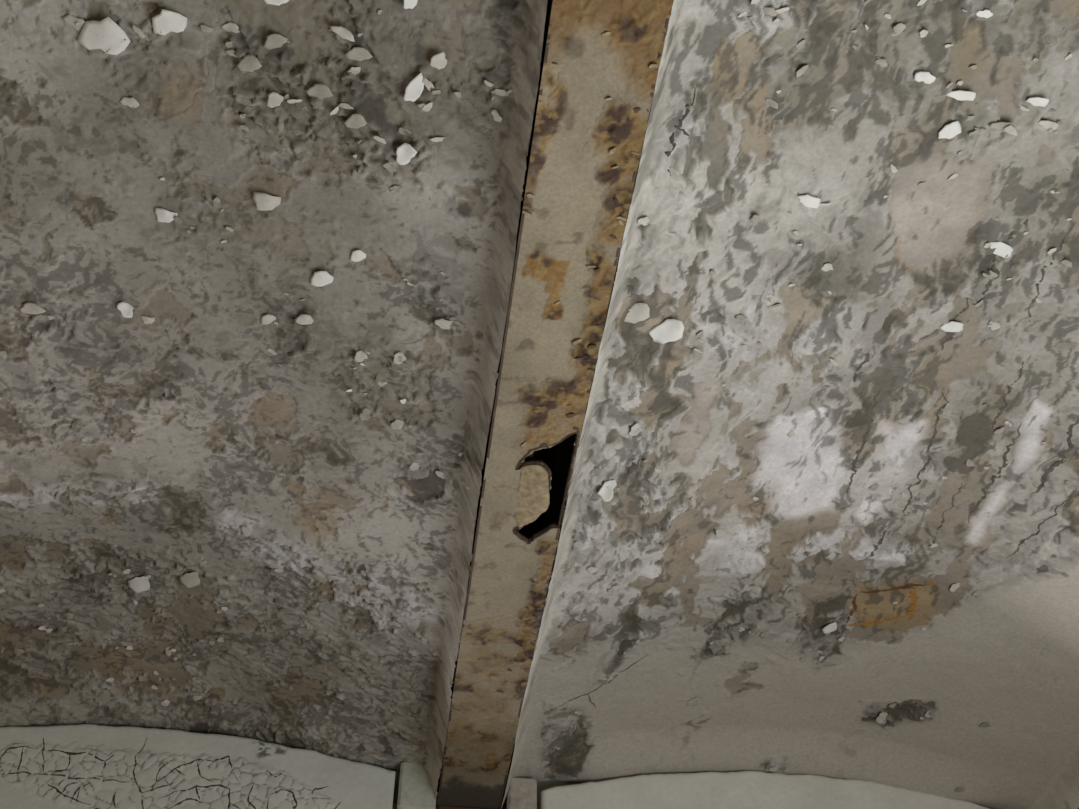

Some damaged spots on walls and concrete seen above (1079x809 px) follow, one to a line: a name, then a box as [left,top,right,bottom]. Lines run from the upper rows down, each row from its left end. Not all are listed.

flaking render [669,0,1079,554]
damp [0,473,190,513]
damp [379,437,480,529]
peeling [534,268,868,656]
damp [206,476,451,669]
flaking render [591,608,648,685]
flaking render [680,580,774,679]
peeling [786,584,857,674]
rust [846,575,946,636]
crack [0,737,341,809]
damp [176,717,425,767]
peeling [854,696,943,730]